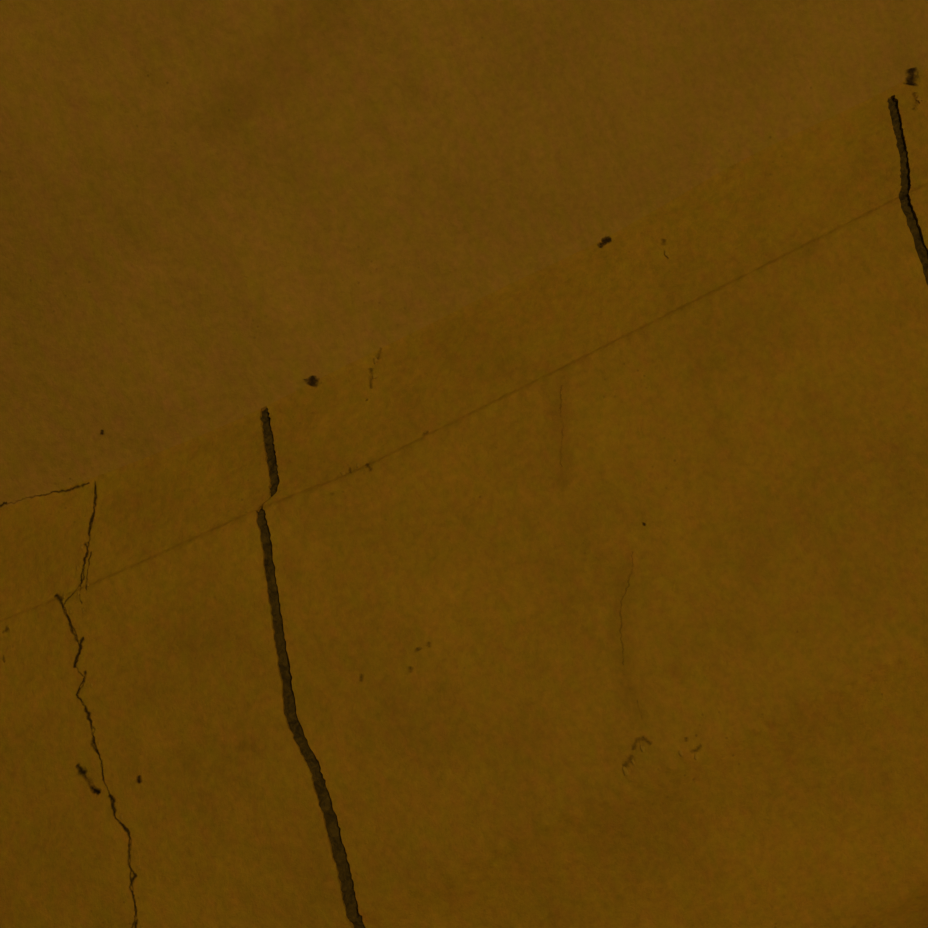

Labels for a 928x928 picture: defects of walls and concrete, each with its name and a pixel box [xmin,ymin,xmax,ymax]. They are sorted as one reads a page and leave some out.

crack [37,483,143,928]